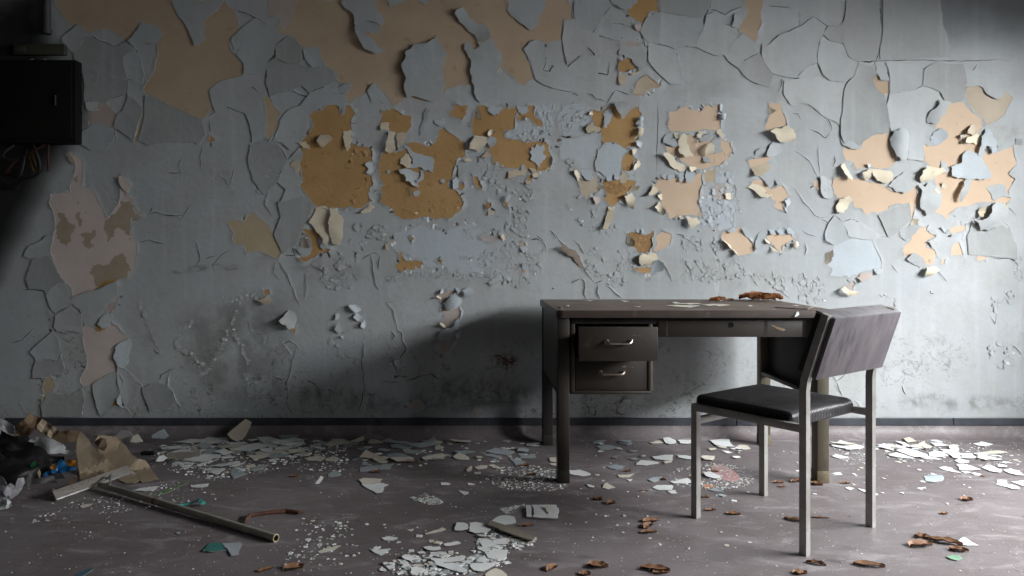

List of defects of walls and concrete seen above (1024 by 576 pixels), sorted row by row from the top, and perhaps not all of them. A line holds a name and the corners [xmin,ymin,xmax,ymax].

peeling [45,148,148,391]
crack [10,233,183,418]
crack [61,8,443,414]
peeling [334,304,367,340]
peeling [222,0,886,330]
crack [524,0,1011,299]
crack [832,374,862,407]
peeling [873,64,890,97]
peeling [808,69,1023,277]
crack [967,204,1022,274]
crack [990,300,999,327]
crack [1012,345,1022,355]